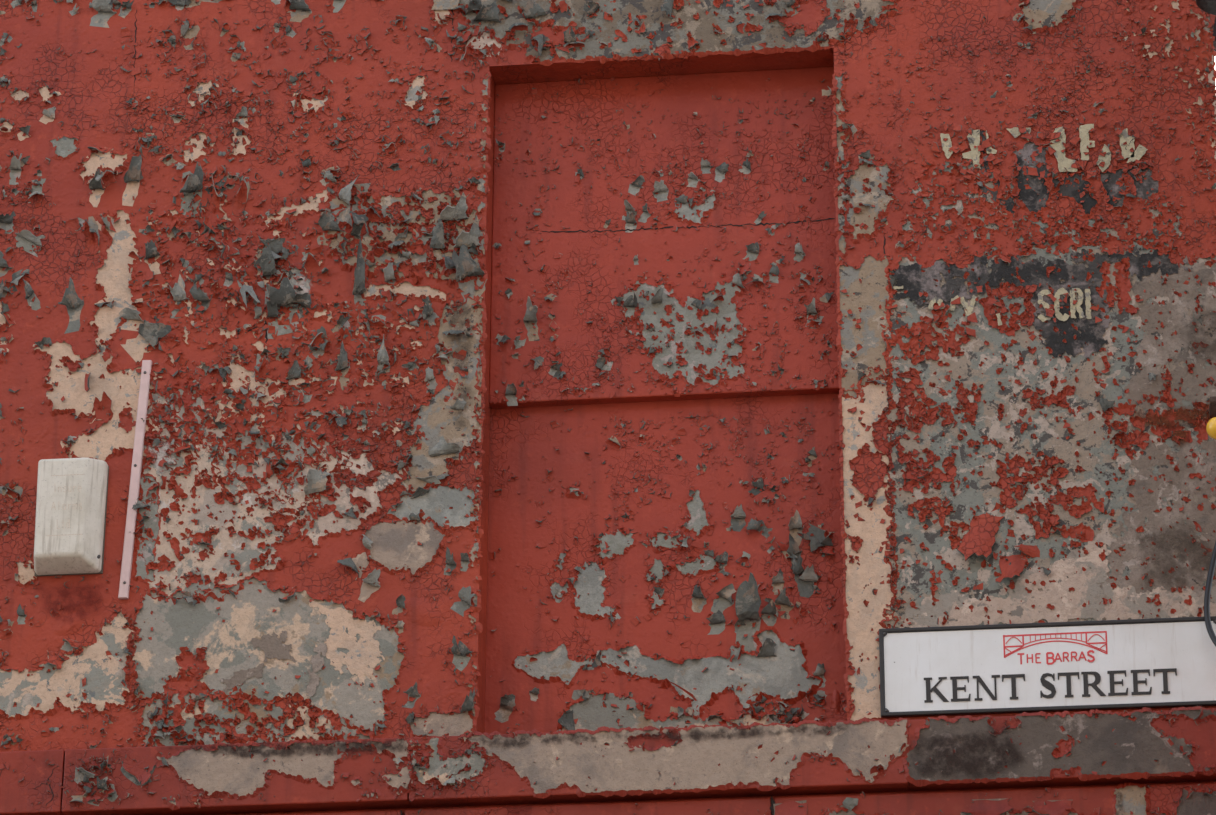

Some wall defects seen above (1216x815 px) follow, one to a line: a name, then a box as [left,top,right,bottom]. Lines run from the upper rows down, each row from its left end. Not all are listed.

peeling [0,0,134,37]
peeling [143,0,222,14]
peeling [326,0,346,19]
peeling [0,31,24,64]
peeling [0,114,31,141]